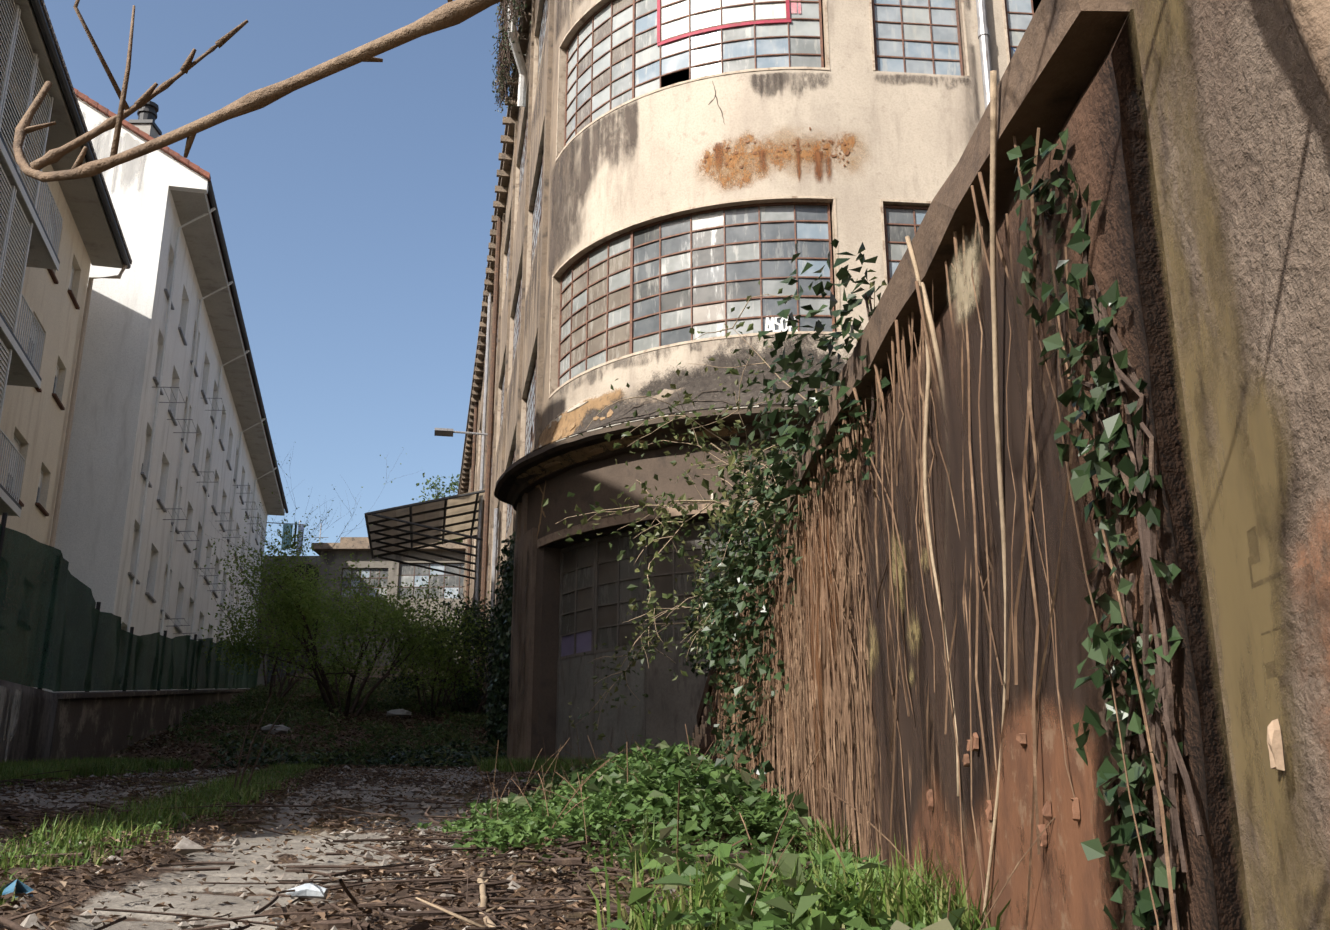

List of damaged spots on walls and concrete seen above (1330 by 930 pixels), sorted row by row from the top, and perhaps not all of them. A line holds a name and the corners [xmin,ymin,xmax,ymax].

water stain [525,102,638,328]
water stain [496,350,527,472]
water stain [516,333,853,484]